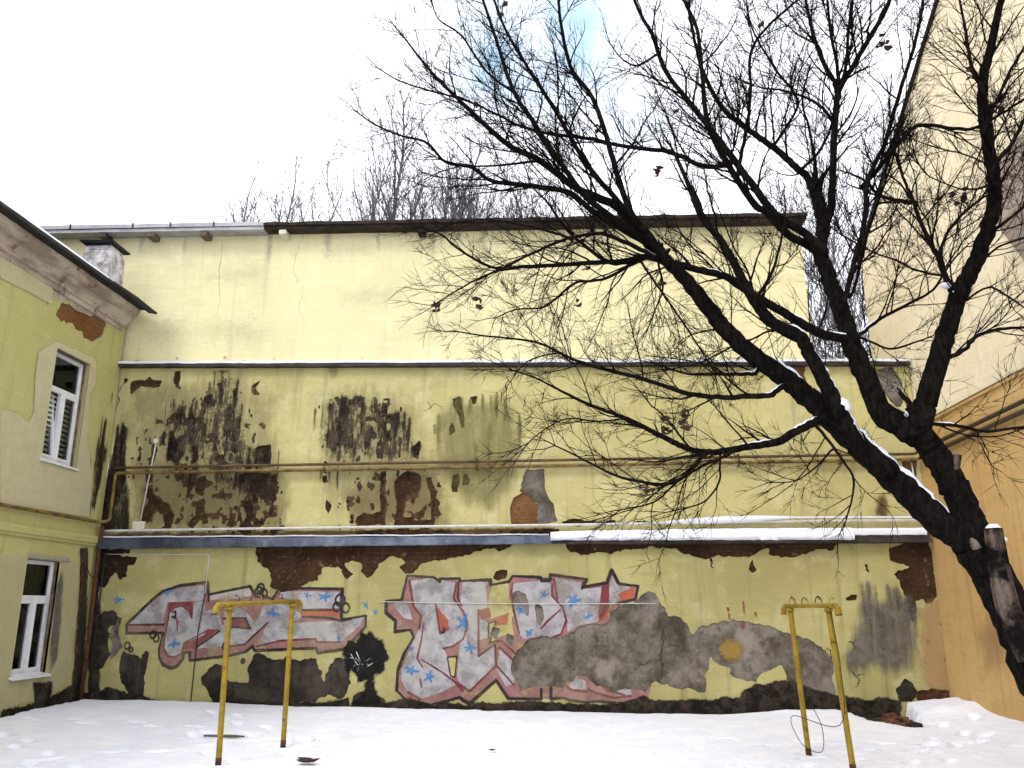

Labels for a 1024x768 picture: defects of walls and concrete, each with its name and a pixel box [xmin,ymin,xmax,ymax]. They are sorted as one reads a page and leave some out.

flaking render [46,290,105,341]
leakage [91,418,129,530]
leakage [164,357,279,511]
leakage [314,393,413,485]
flaking render [129,381,615,592]
flaking render [566,541,837,573]
flaking render [889,543,937,621]
flaking render [98,610,149,695]
flaking render [201,653,351,703]
flaking render [491,591,836,694]
leakage [846,584,947,688]